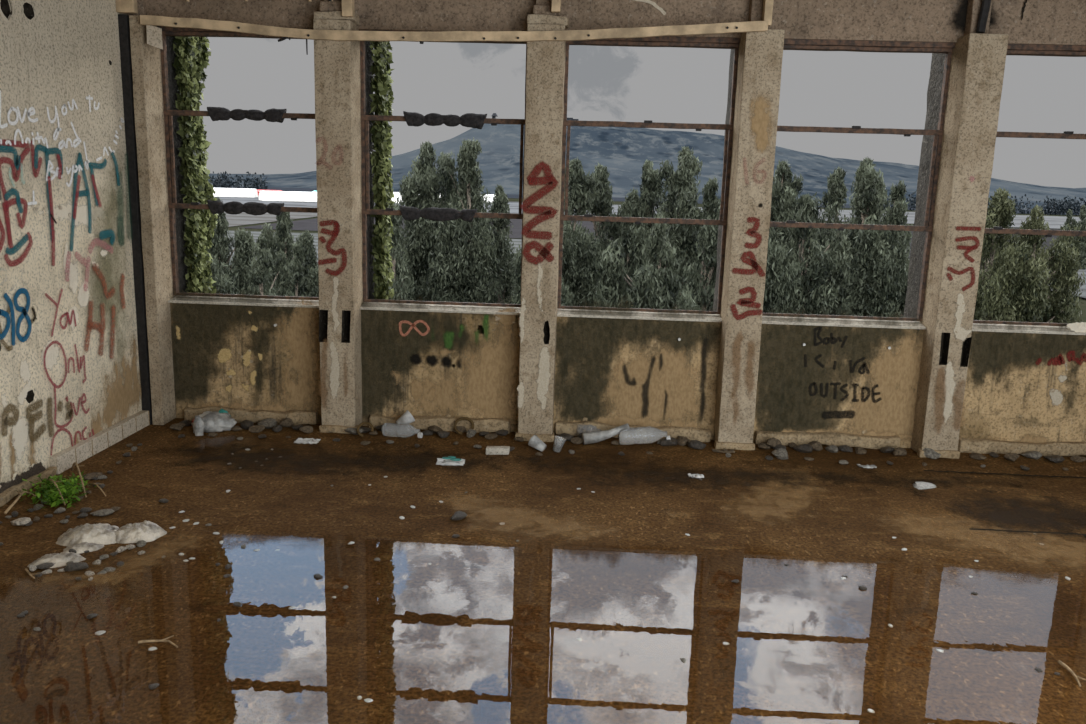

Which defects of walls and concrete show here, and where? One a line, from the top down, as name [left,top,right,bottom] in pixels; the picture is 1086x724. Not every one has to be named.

damp [170,291,320,411]
damp [554,300,721,423]
damp [0,435,15,479]